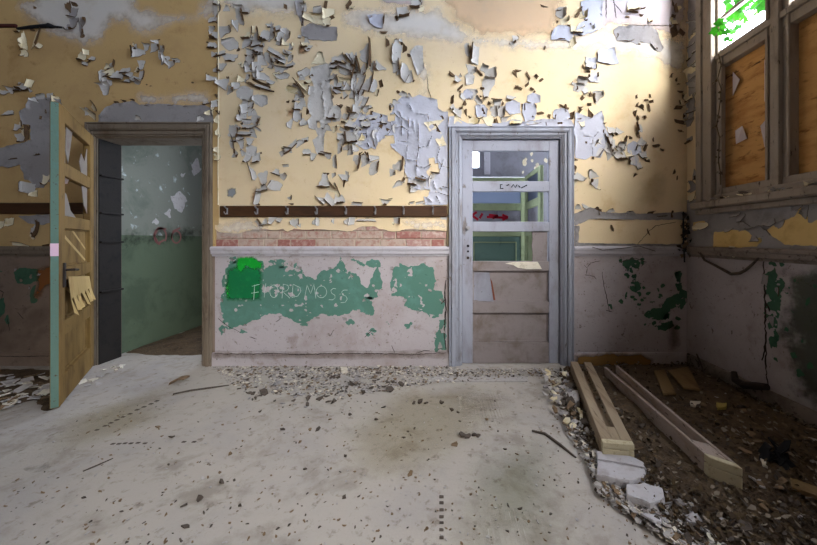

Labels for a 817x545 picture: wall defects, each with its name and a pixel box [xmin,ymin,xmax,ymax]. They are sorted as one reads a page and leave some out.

peeling [14,0,171,66]
peeling [0,79,62,197]
peeling [80,0,696,208]
peeling [152,191,187,225]
peeling [574,169,817,258]
peeling [14,268,41,303]
peeling [219,256,447,352]
peeling [608,257,688,331]
crack [761,261,770,385]
peeling [761,262,798,362]